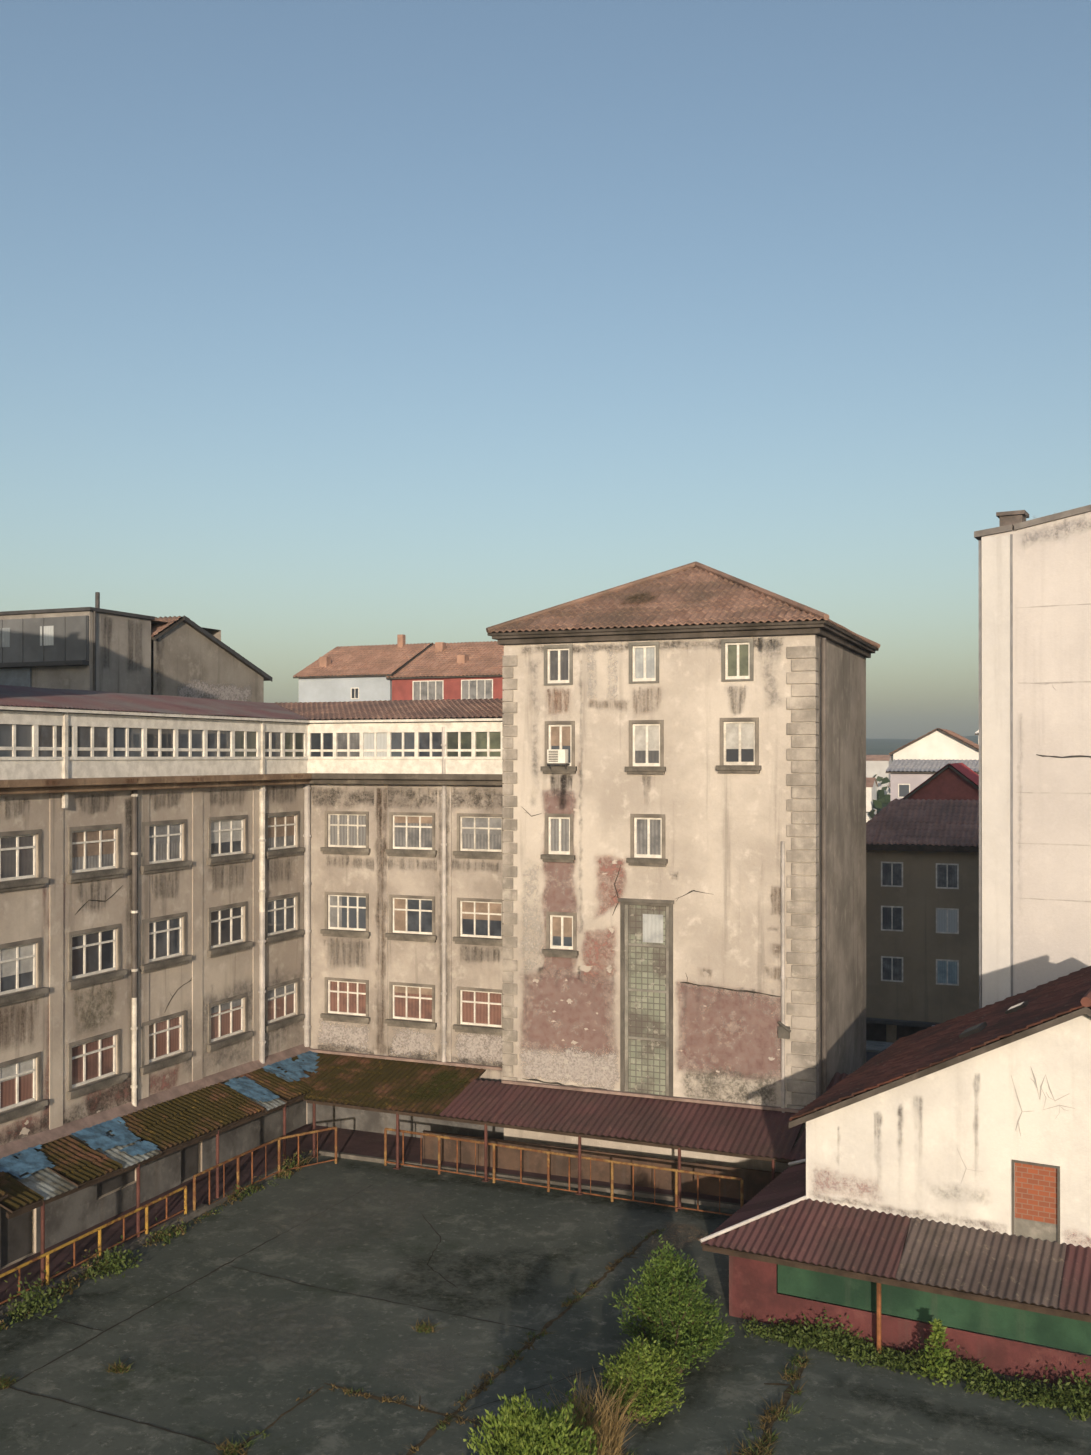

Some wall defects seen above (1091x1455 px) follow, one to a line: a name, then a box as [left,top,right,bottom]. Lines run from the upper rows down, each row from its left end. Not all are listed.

peeling [544,791,580,815]
crack [1036,752,1091,760]
peeling [518,852,625,1056]
peeling [677,983,781,1079]
crack [0,1185,657,1455]